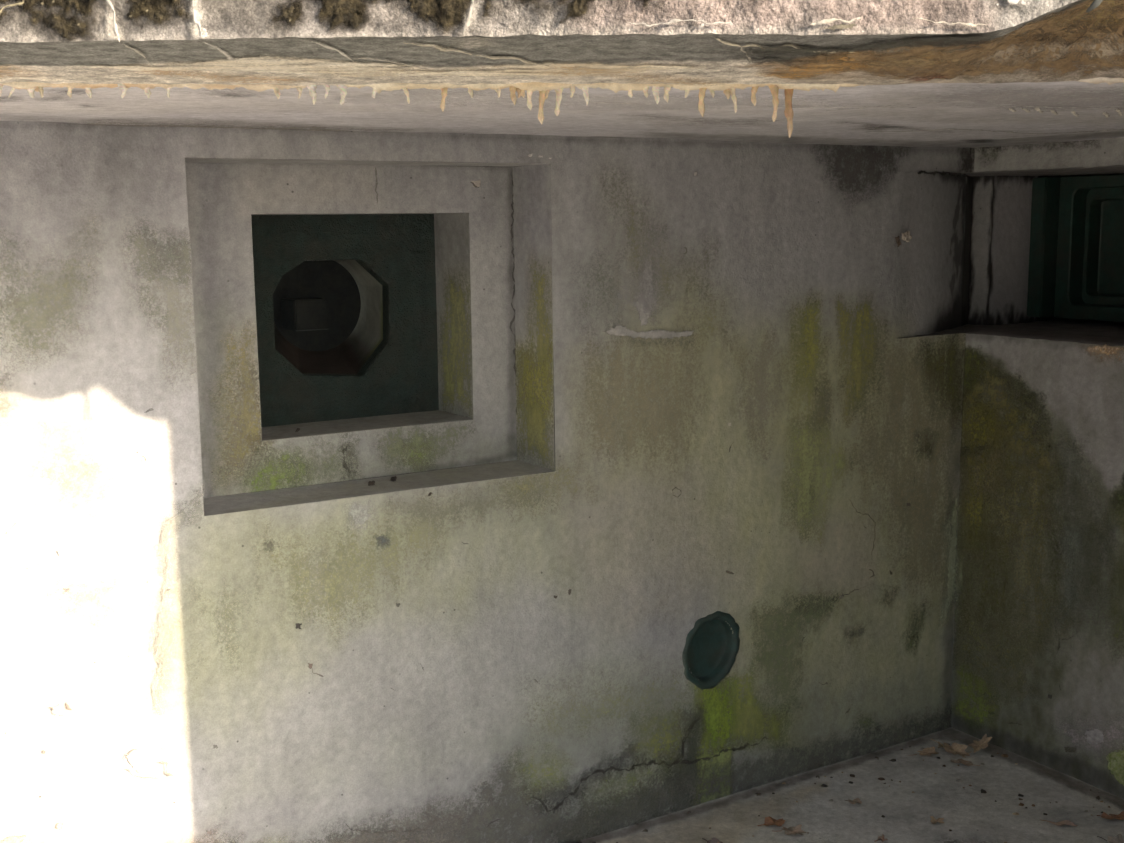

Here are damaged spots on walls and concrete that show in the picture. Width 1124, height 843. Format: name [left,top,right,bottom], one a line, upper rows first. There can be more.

damp [0,56,1124,134]
damp [787,296,964,600]
crack [533,716,768,813]